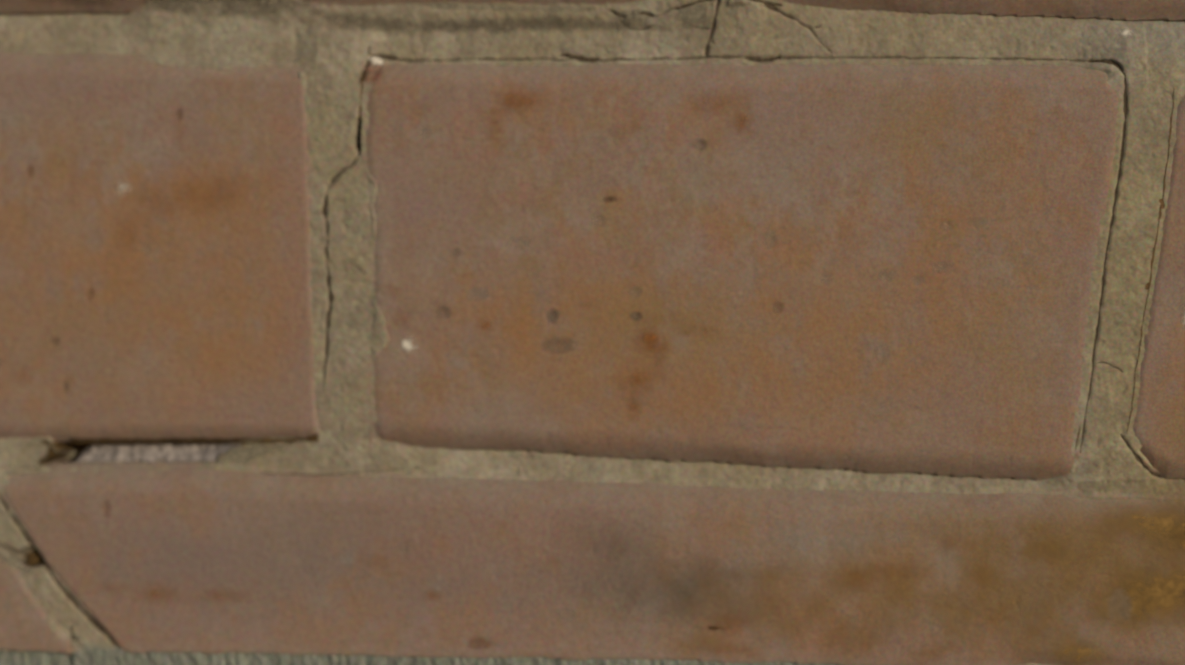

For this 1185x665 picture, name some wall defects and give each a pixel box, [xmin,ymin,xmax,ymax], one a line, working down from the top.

crack [322,0,1174,478]
crack [0,497,119,650]